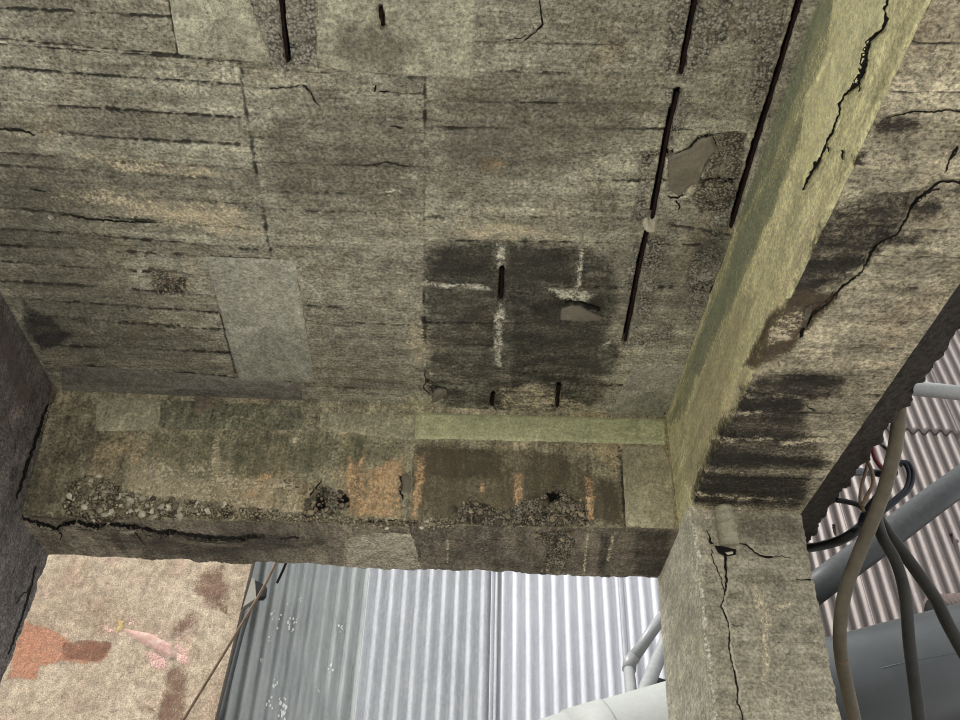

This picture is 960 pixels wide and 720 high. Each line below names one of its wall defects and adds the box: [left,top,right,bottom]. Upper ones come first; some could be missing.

spalling [251,0,319,68]
leakage [406,222,625,413]
crack [505,0,544,41]
spalling [496,265,603,322]
spalling [622,0,803,349]
leakage [691,189,960,511]
crack [802,0,889,191]
crack [799,146,960,338]
crack [16,403,300,547]
spalling [60,474,591,574]
corrosion [345,454,425,517]
crack [707,532,811,720]